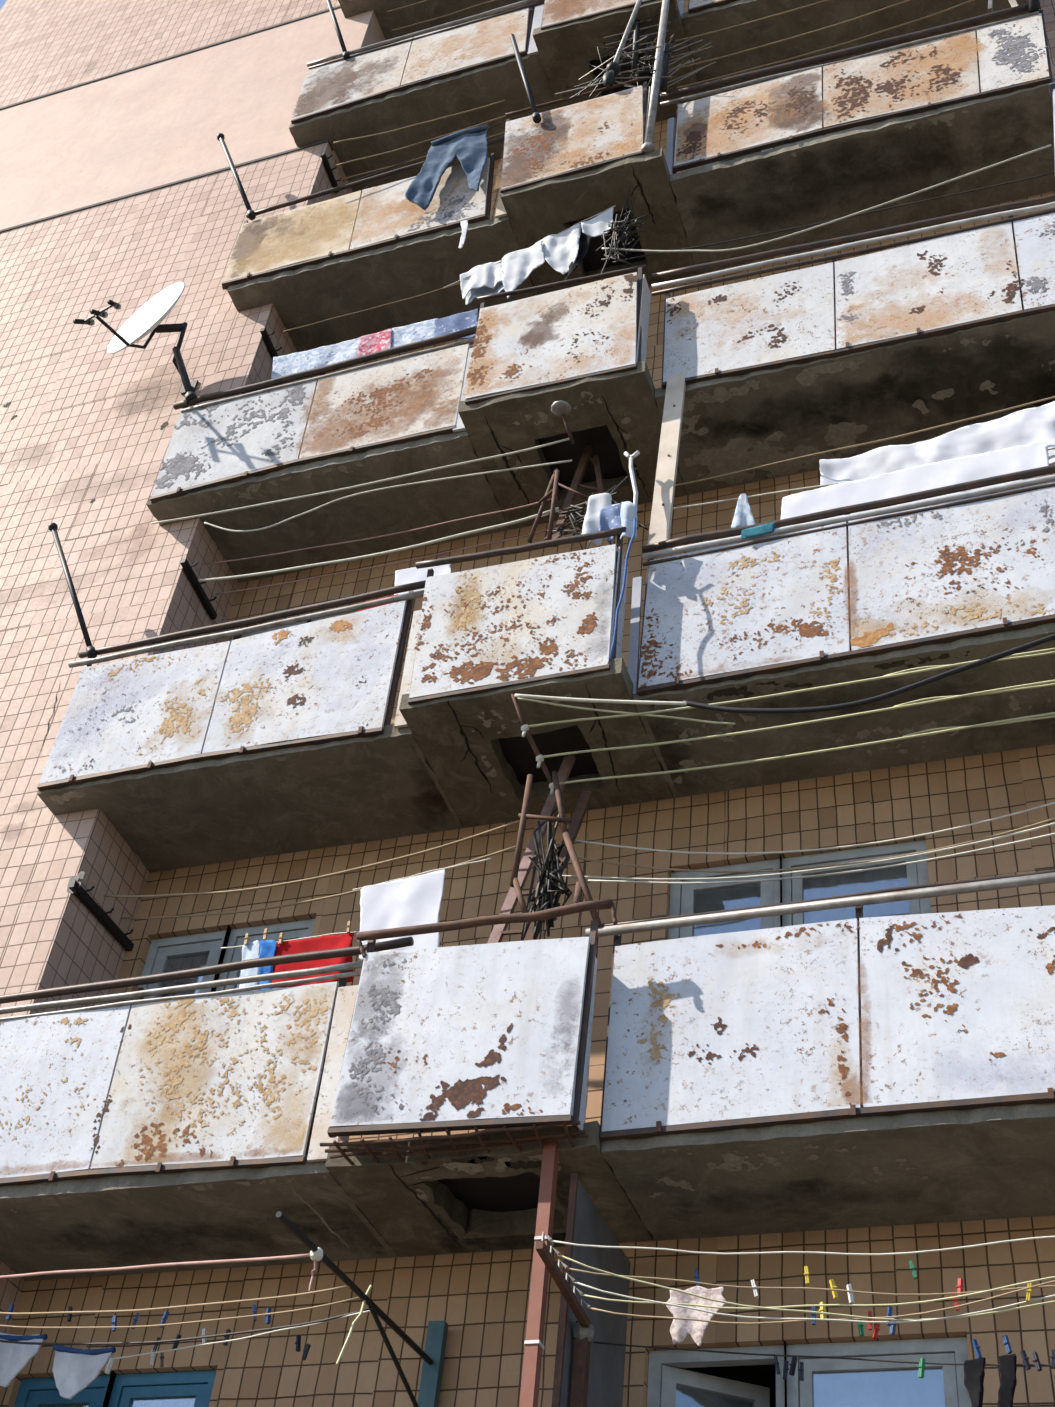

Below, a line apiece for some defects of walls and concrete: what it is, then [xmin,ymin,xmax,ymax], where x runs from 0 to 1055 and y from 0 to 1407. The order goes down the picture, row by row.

rust [676,45,964,160]
rust [300,368,455,452]
rust [272,630,293,645]
rust [329,620,352,633]
rust [420,612,598,684]
rust [641,602,692,681]
rust [708,618,834,661]
rust [845,568,896,647]
crack [447,700,492,792]
rust [418,1023,513,1121]
rust [116,1122,213,1166]
spalling [320,1099,589,1200]